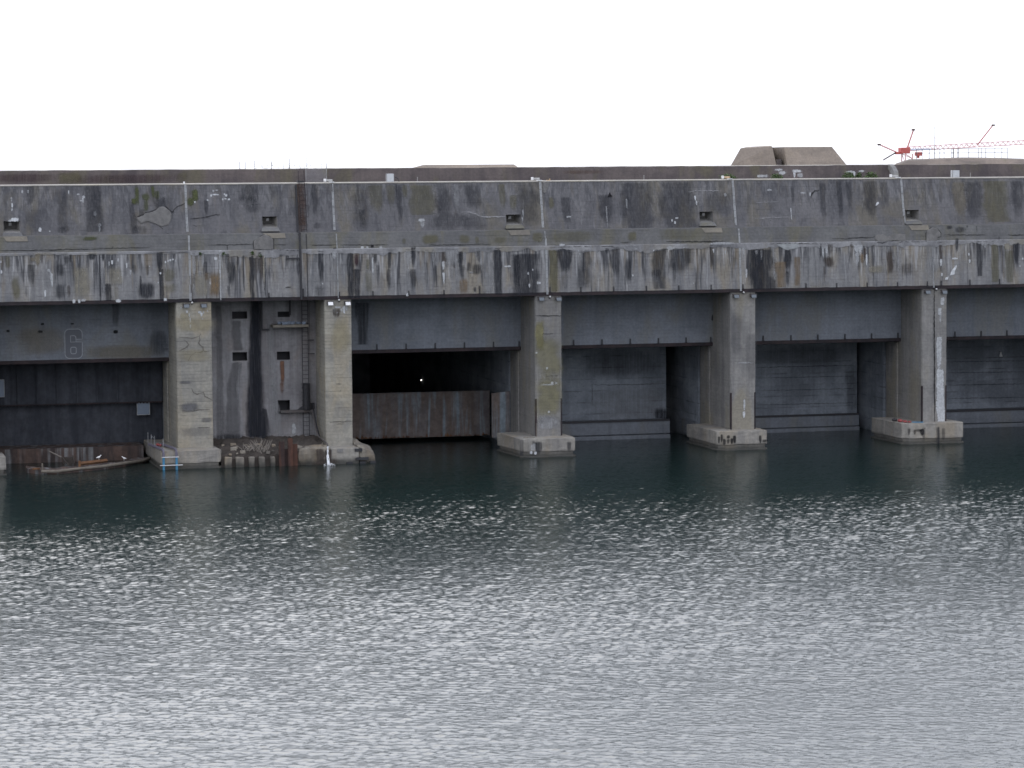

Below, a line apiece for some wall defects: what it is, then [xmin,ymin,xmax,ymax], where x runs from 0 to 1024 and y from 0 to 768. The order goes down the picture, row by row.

damp [72,254,127,303]
damp [140,253,176,301]
damp [335,253,391,345]
damp [406,236,480,296]
damp [494,250,541,295]
damp [558,247,572,269]
damp [612,247,690,289]
damp [746,246,791,289]
damp [854,243,899,272]
damp [933,226,987,284]
damp [192,251,269,439]